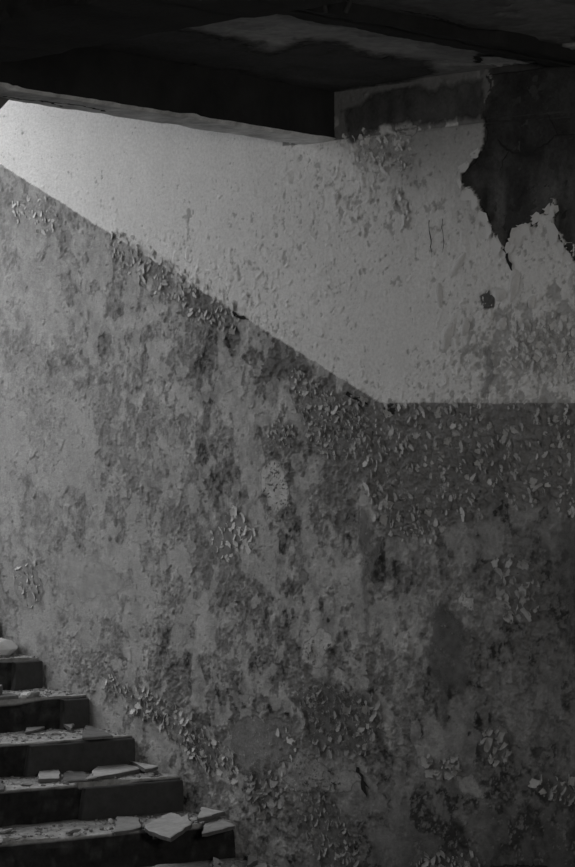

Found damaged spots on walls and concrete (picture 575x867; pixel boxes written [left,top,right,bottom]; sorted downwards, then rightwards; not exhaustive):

peeling [338,121,417,175]
spalling [456,57,575,271]
spalling [476,286,498,317]
peeling [503,312,575,389]
peeling [267,368,575,544]
flaking render [261,459,290,517]
peeling [210,505,255,562]
flaking render [103,628,384,867]
peeling [478,720,513,768]
peeling [528,771,575,806]
peeling [416,850,480,867]